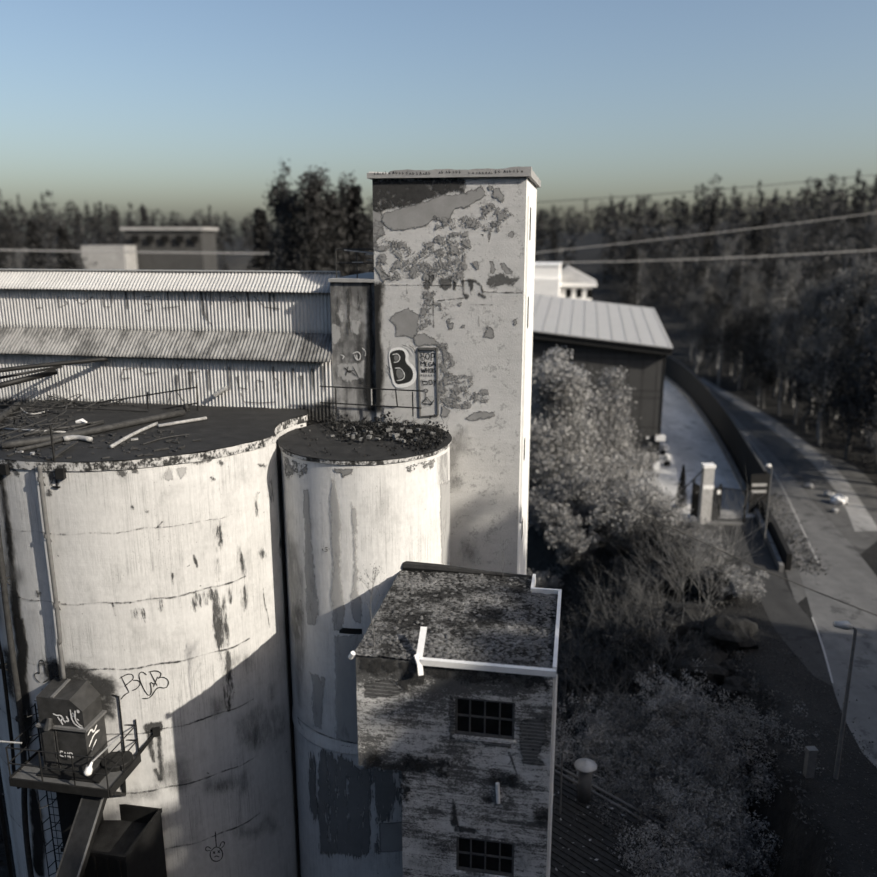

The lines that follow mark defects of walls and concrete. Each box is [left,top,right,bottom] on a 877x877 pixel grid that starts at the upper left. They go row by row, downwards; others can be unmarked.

damp [365,282,384,413]
spalling [373,185,519,421]
damp [0,475,35,747]
damp [303,490,318,625]
damp [330,479,550,744]
damp [29,789,45,877]
peeling [308,748,402,861]
damp [364,753,456,802]